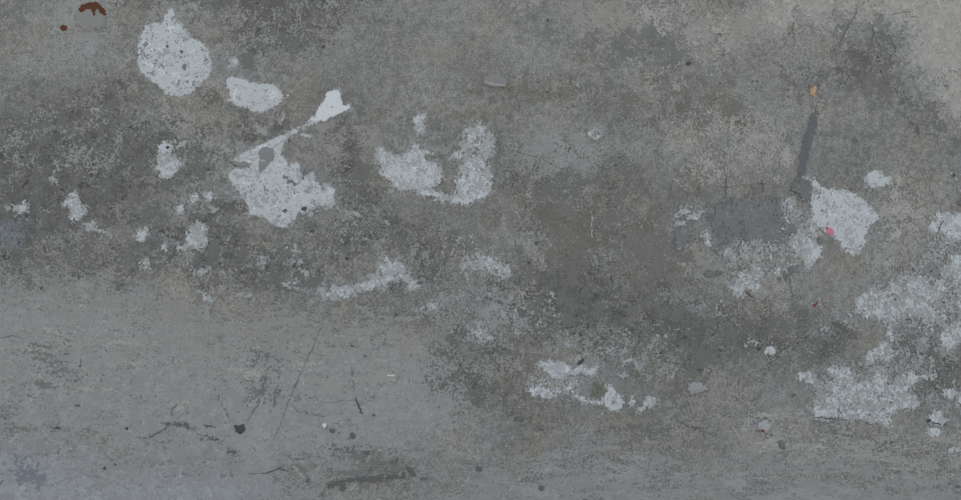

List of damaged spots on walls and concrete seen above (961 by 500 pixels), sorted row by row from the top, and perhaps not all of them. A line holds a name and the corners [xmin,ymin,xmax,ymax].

rust [60,1,107,37]
leakage [169,0,478,80]
leakage [834,155,961,294]
crack [138,404,206,439]
crack [213,356,268,422]
crack [274,316,362,439]